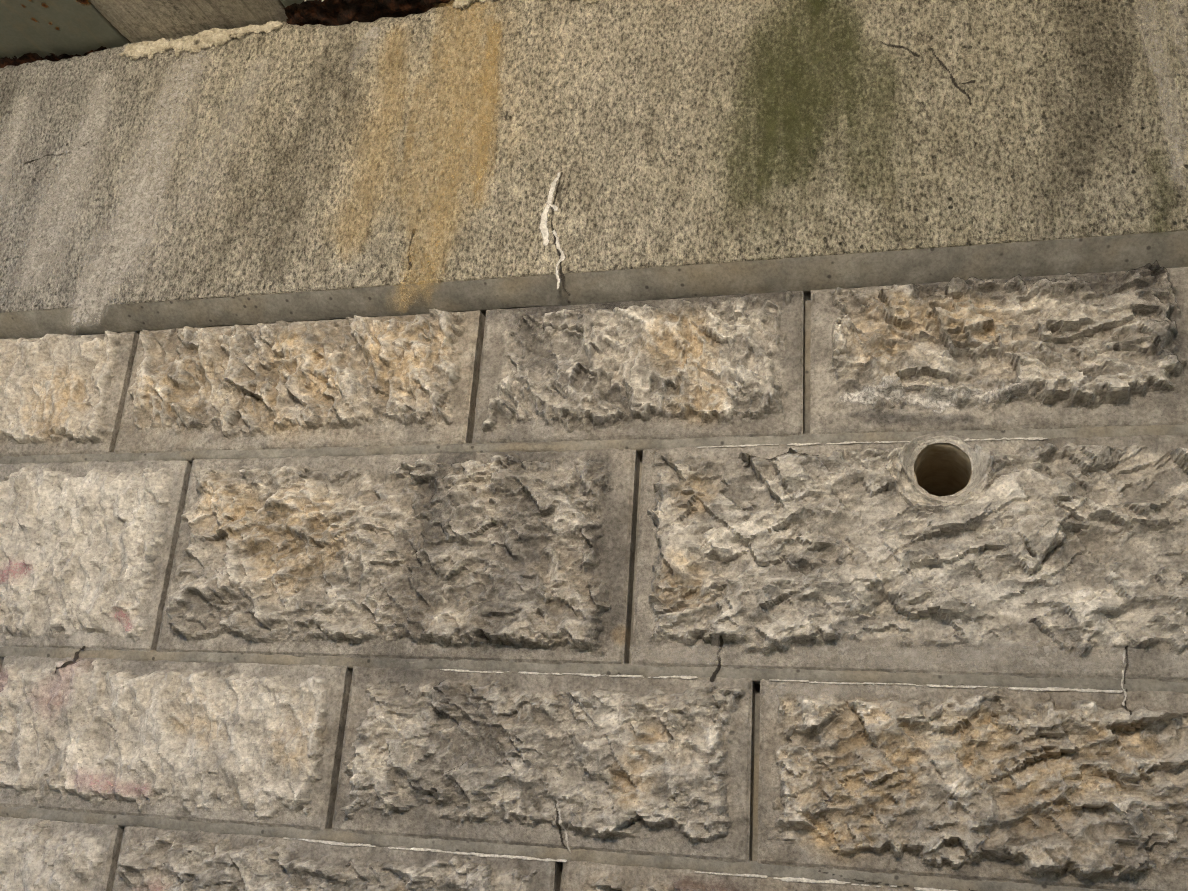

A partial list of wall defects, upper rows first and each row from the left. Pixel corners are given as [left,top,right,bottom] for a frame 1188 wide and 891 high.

corrosion [0,46,107,68]
crack [882,42,975,105]
crack [539,172,570,296]